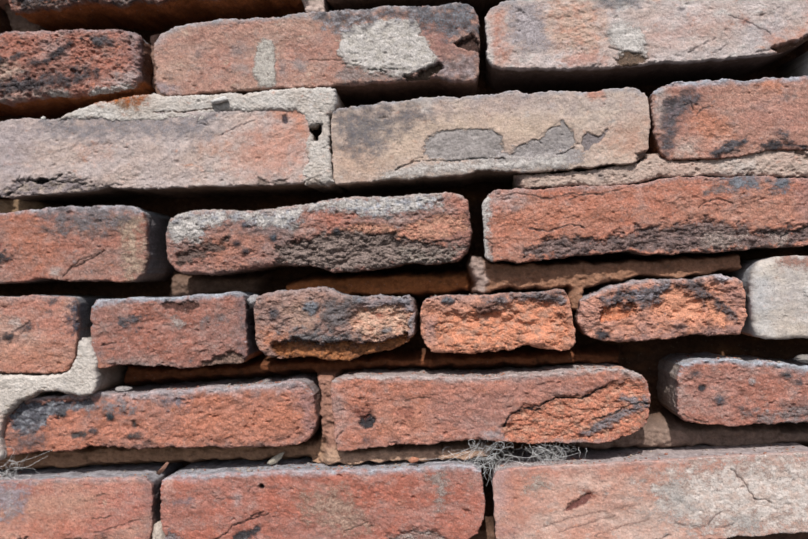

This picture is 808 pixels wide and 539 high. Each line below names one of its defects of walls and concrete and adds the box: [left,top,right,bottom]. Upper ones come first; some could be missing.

peeling [422,120,607,173]
crack [5,174,86,197]
crack [217,512,269,539]